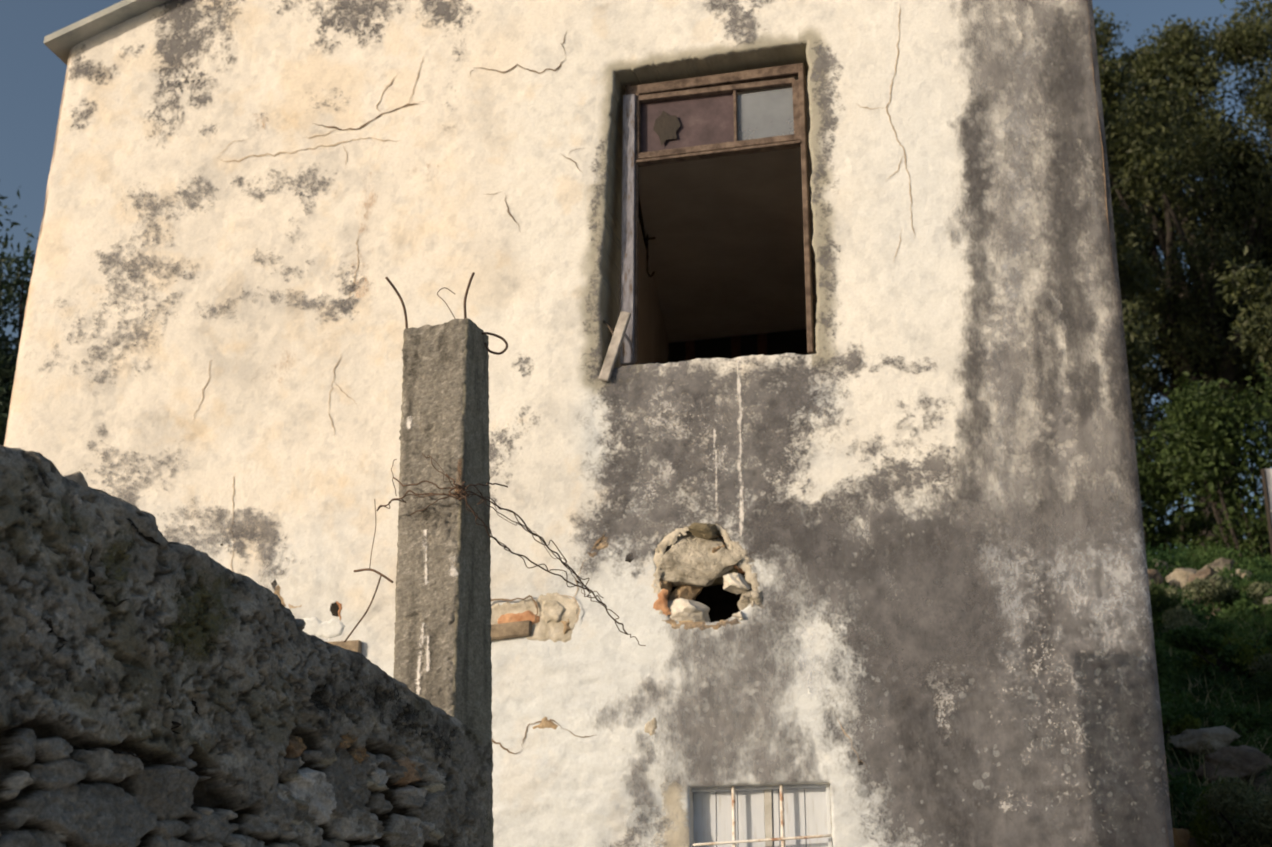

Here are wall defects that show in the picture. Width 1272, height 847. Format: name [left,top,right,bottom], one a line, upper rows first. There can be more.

damp [126,0,237,137]
crack [219,58,423,167]
damp [277,0,400,50]
crack [470,31,567,75]
crack [859,7,915,256]
damp [67,176,213,383]
damp [197,252,364,321]
damp [571,0,1174,847]
damp [164,499,294,590]
flaking render [491,593,581,643]
spalling [651,523,764,631]
crack [492,719,593,754]